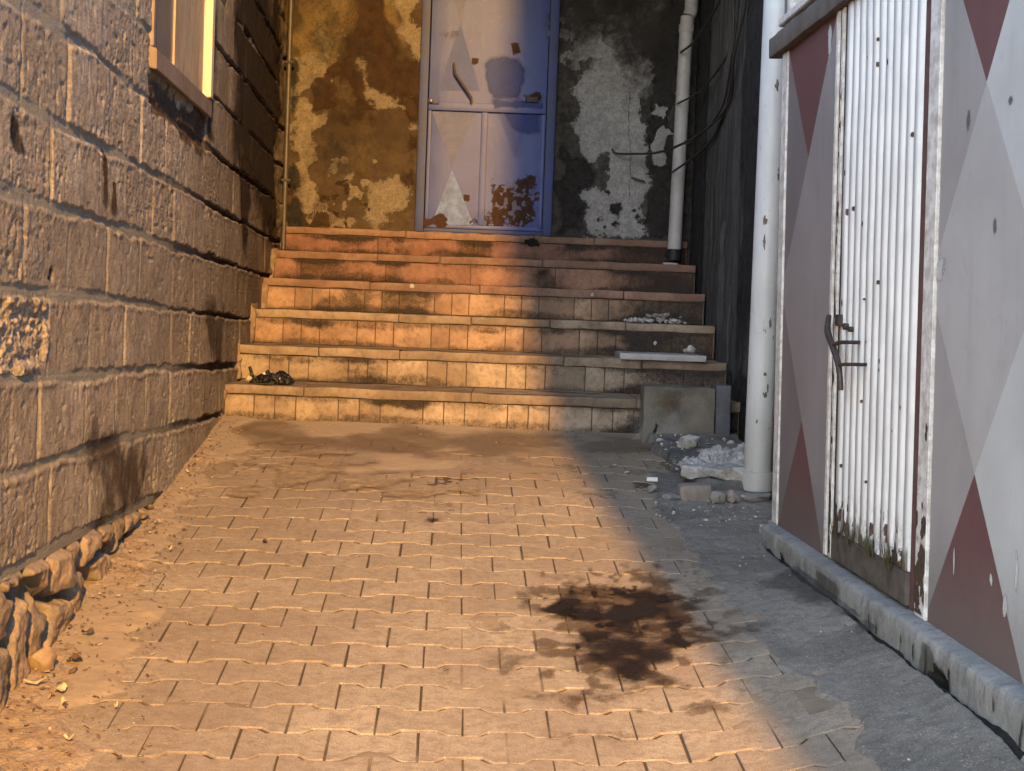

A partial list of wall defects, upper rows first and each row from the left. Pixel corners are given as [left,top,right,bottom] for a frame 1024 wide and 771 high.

peeling [384,0,421,63]
peeling [287,0,414,230]
flaking render [547,0,664,240]
corrosion [424,174,540,228]
water stain [202,299,224,372]
water stain [541,591,691,682]